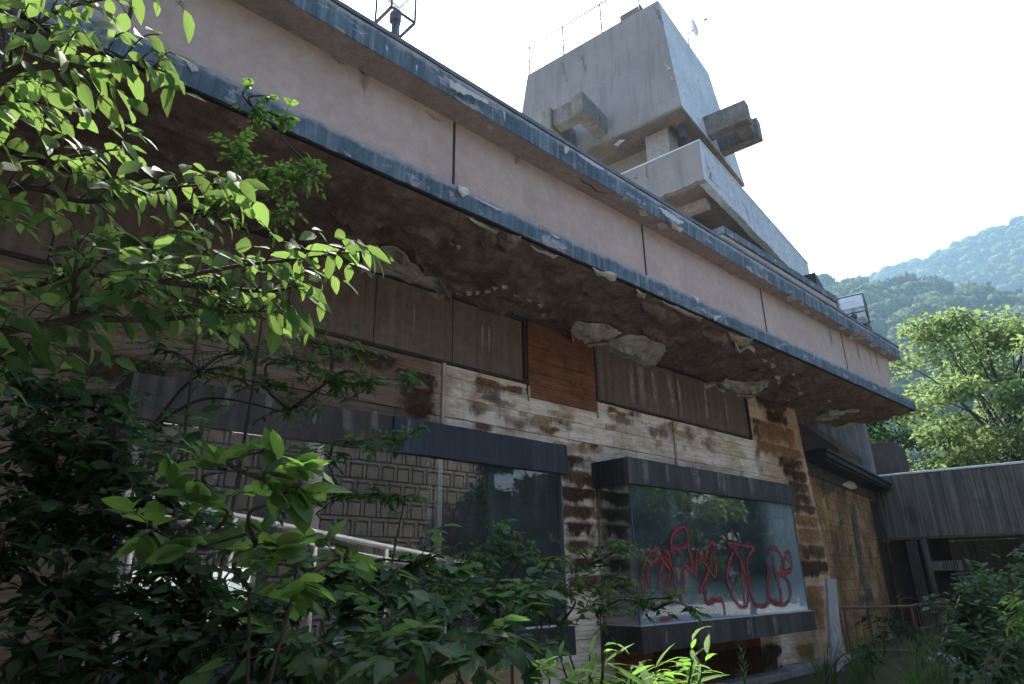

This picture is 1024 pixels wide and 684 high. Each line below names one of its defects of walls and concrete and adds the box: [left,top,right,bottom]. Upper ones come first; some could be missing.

peeling [449,79,489,105]
peeling [466,216,499,234]
peeling [659,207,684,233]
peeling [360,246,546,318]
peeling [592,267,617,281]
water stain [64,345,190,382]
water stain [302,338,435,418]
peeling [564,321,666,367]
peeling [704,332,795,400]
water stain [470,384,571,432]
water stain [628,368,716,451]
water stain [562,442,602,591]